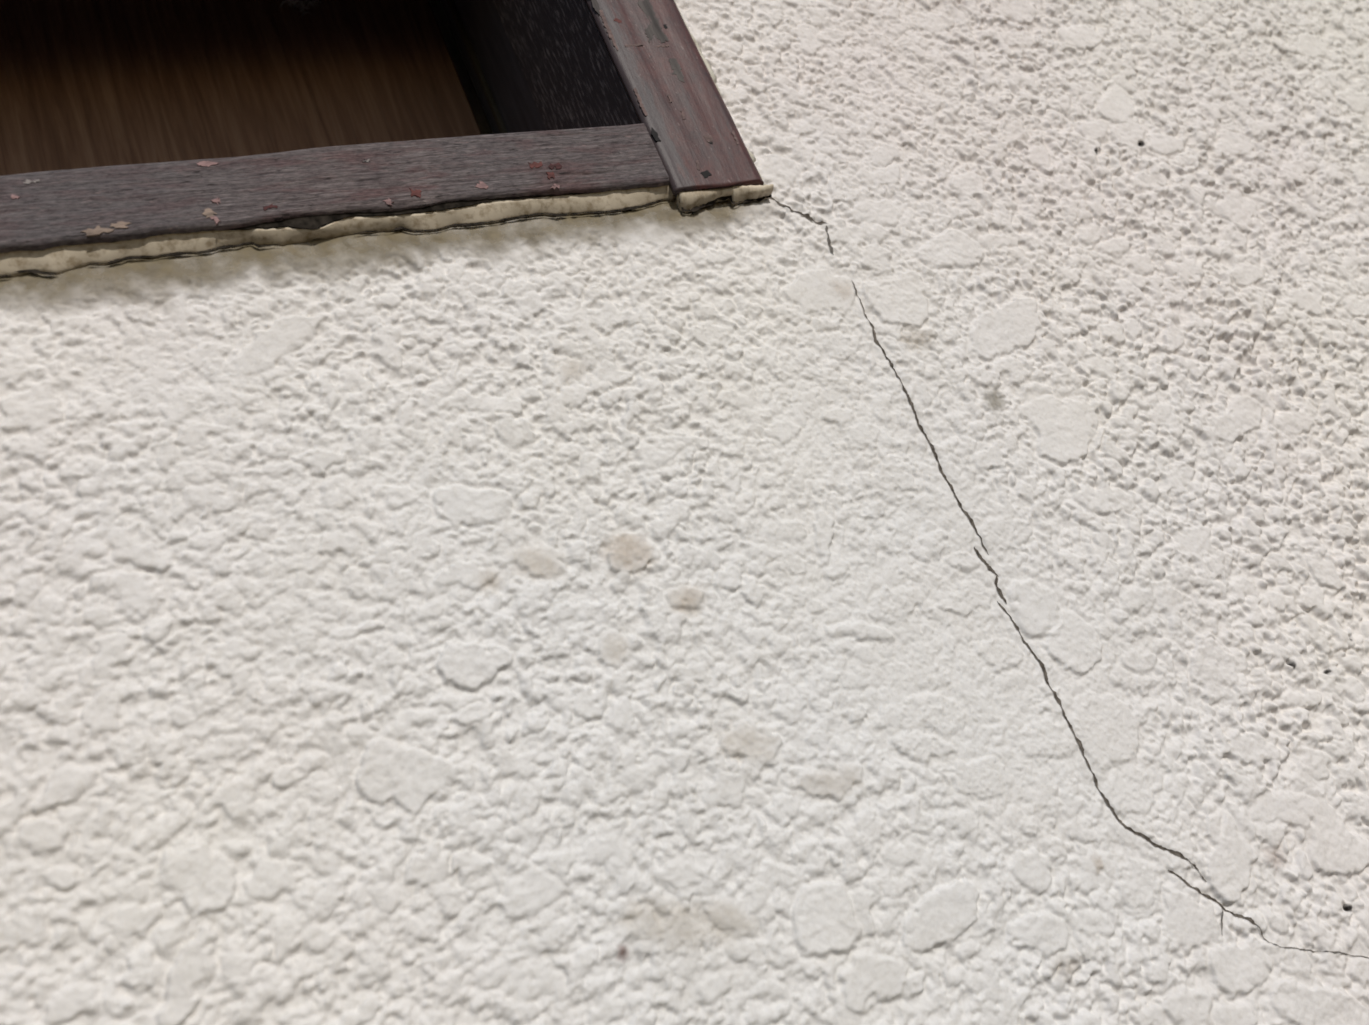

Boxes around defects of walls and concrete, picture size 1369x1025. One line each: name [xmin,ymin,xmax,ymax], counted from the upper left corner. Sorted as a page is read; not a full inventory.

crack [354,195,833,254]
crack [852,281,1369,958]